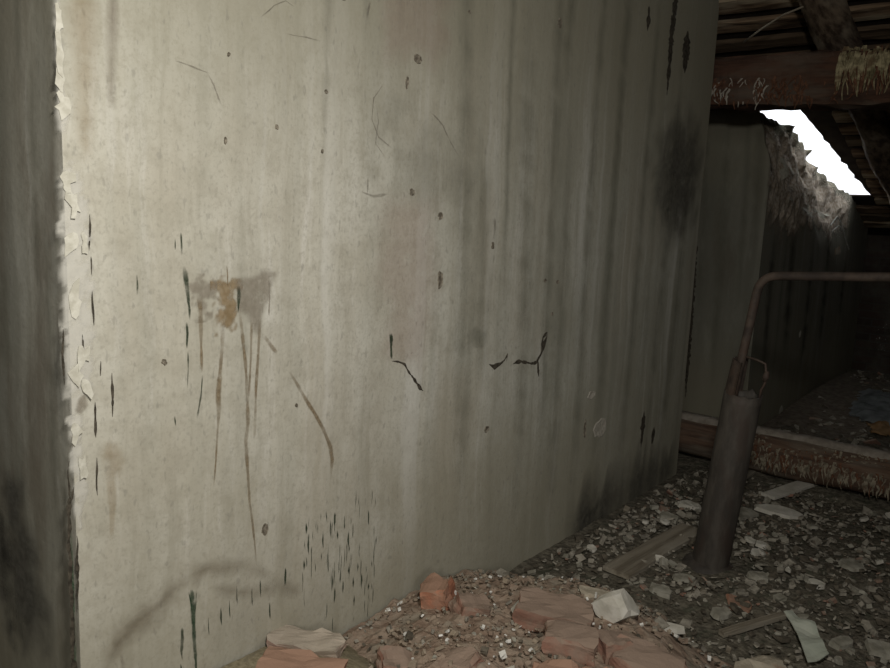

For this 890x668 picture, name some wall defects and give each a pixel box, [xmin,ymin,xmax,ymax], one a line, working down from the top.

spalling [54,3,72,130]
flaking render [762,125,850,238]